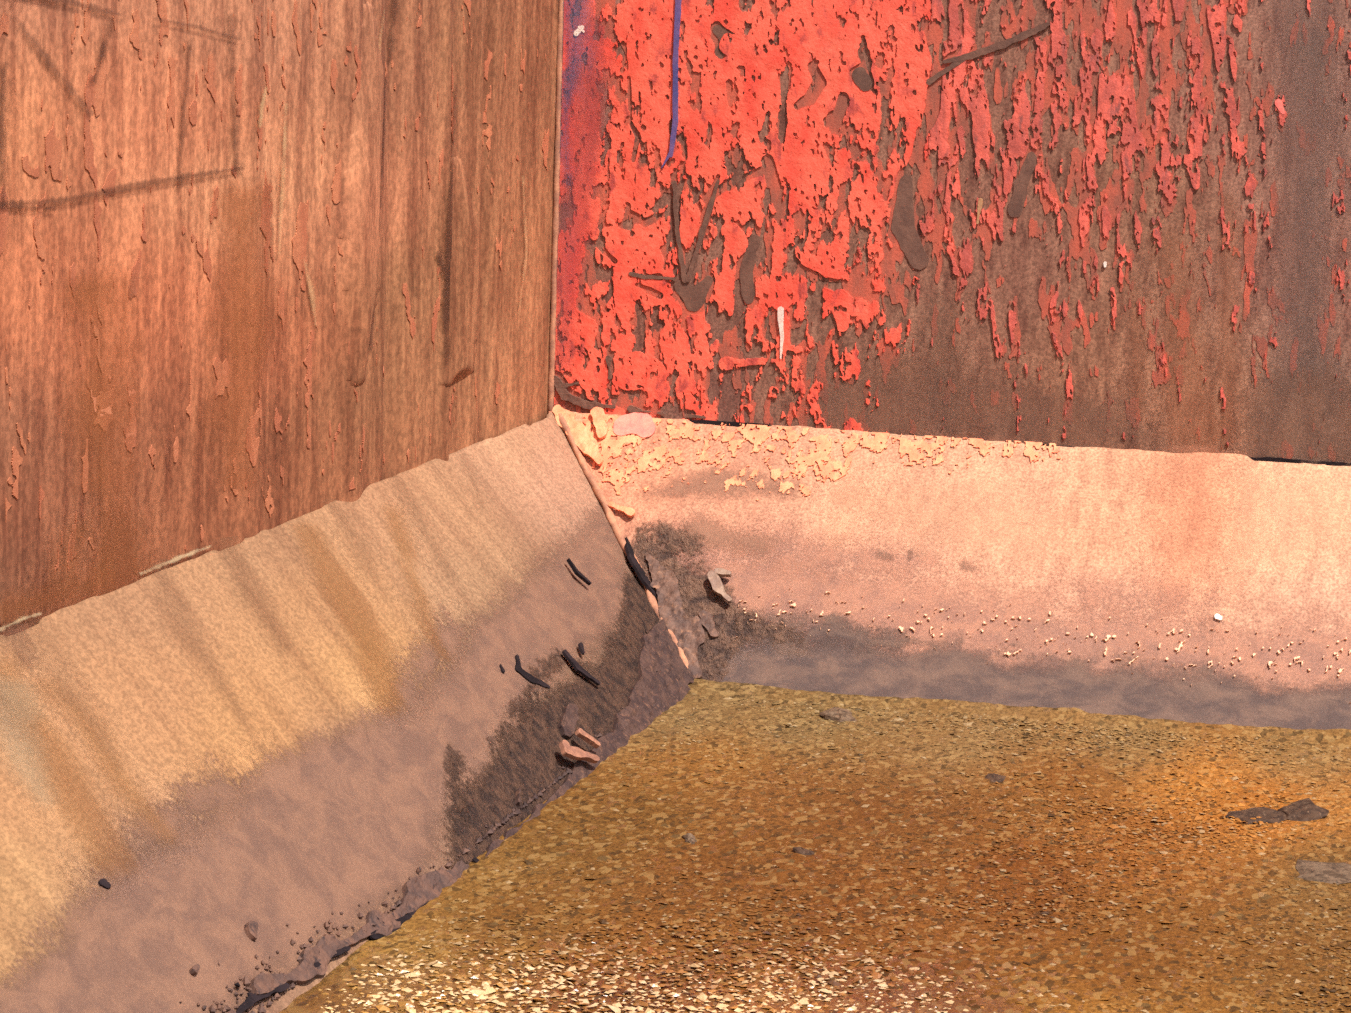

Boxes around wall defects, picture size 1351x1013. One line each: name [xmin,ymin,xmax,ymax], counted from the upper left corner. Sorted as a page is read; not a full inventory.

peeling [5,367,33,523]
peeling [22,57,123,297]
peeling [80,186,156,493]
peeling [113,0,243,131]
peeling [173,369,192,462]
peeling [182,186,219,302]
peeling [224,348,290,517]
peeling [251,0,327,277]
peeling [474,0,1287,517]
peeling [1336,260,1350,302]
damp [638,519,1351,730]
damp [0,505,630,1013]